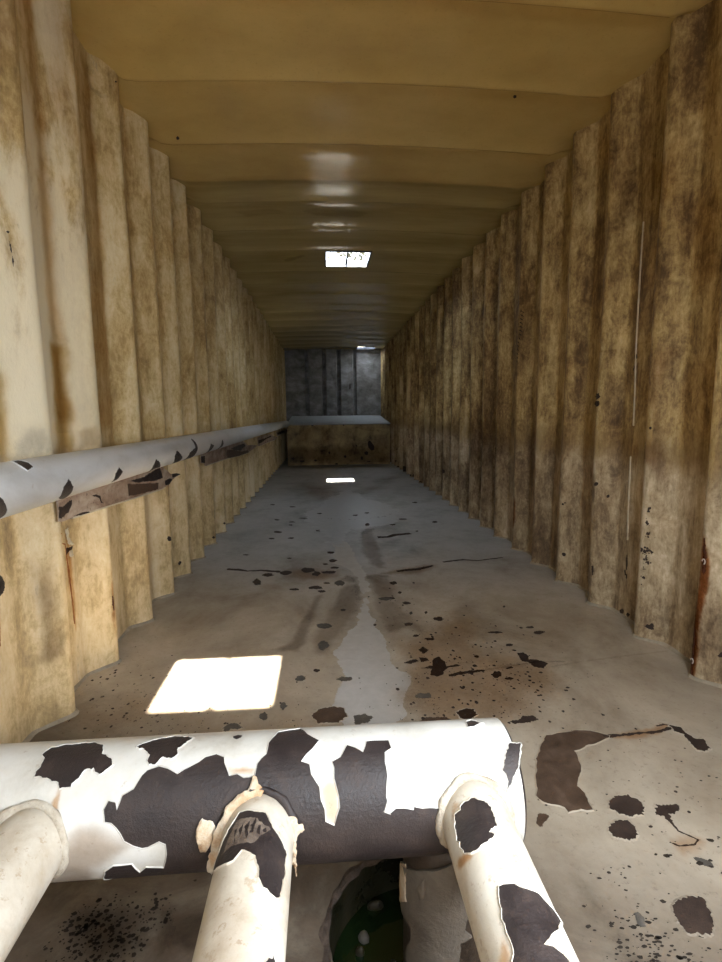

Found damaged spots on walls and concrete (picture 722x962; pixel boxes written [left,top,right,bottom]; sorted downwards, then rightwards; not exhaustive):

peeling [10,460,34,471]
peeling [132,451,182,485]
peeling [0,497,8,519]
peeling [58,479,74,519]
rust [61,528,75,624]
rust [690,538,708,675]
peeling [465,719,484,728]
peeling [33,742,114,790]
peeling [502,742,522,793]
spalling [534,730,610,827]
peeling [102,728,498,962]
peeling [497,883,570,962]